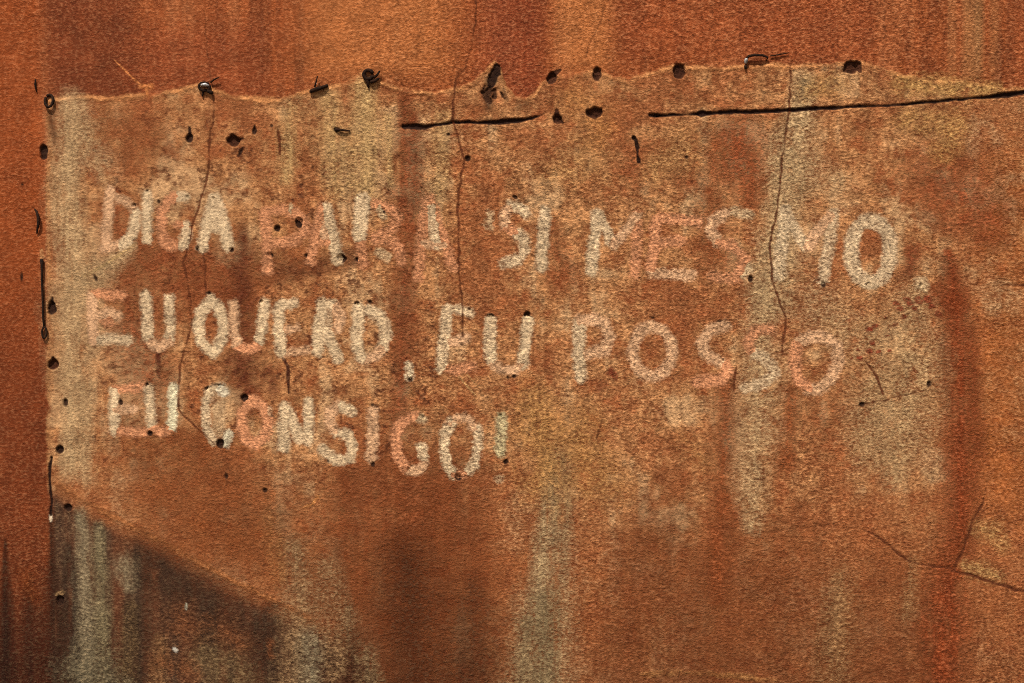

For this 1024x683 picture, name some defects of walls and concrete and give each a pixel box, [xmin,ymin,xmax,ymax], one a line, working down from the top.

corrosion [232,231,357,396]
crack [402,78,539,337]
crack [648,66,1024,353]
damp [45,512,163,683]
damp [142,450,487,683]
corrosion [710,379,739,601]
corrosion [851,249,981,683]